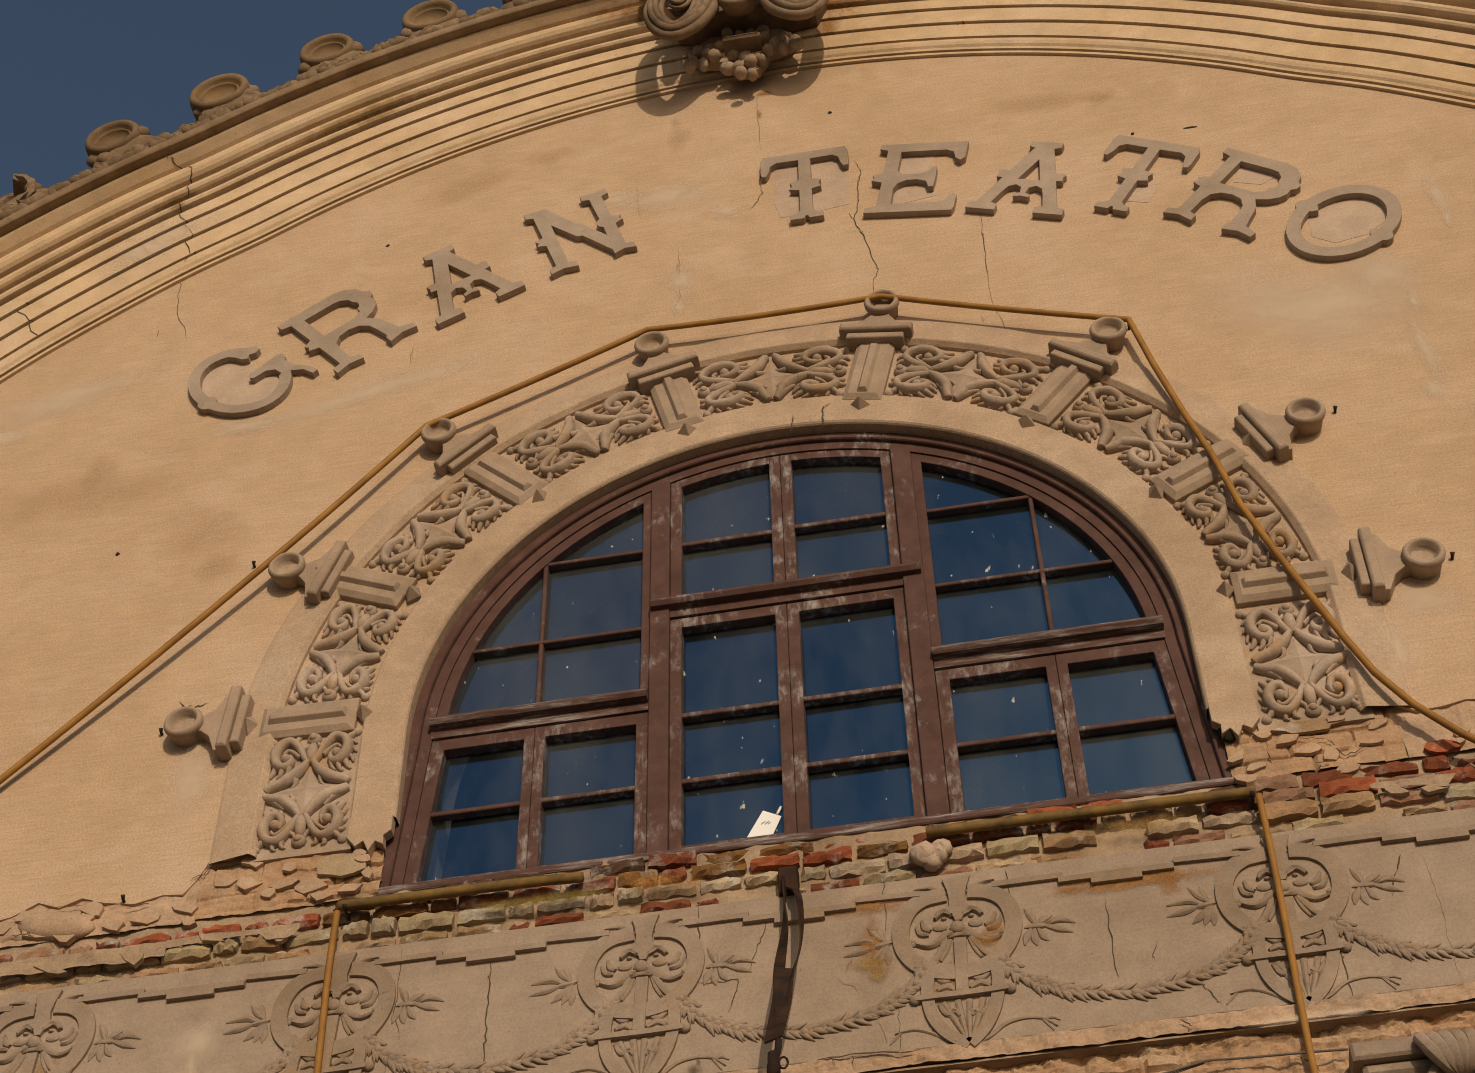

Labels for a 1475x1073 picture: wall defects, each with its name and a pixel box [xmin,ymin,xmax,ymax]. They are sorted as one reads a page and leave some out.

crack [157,157,196,339]
crack [849,163,879,291]
spalling [1221,700,1475,786]
peeling [33,962,69,978]
peeling [119,952,145,969]
spalling [0,848,384,948]
crack [483,962,492,1065]
crack [1105,904,1119,977]